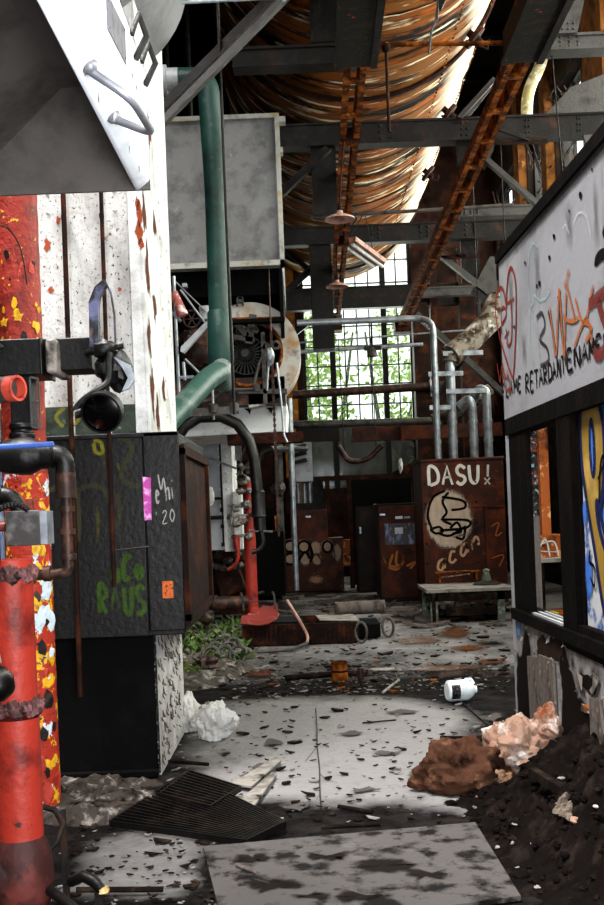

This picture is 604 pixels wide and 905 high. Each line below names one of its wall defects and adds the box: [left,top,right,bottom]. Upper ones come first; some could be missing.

corrosion [135,197,145,250]
peeling [512,624,604,735]